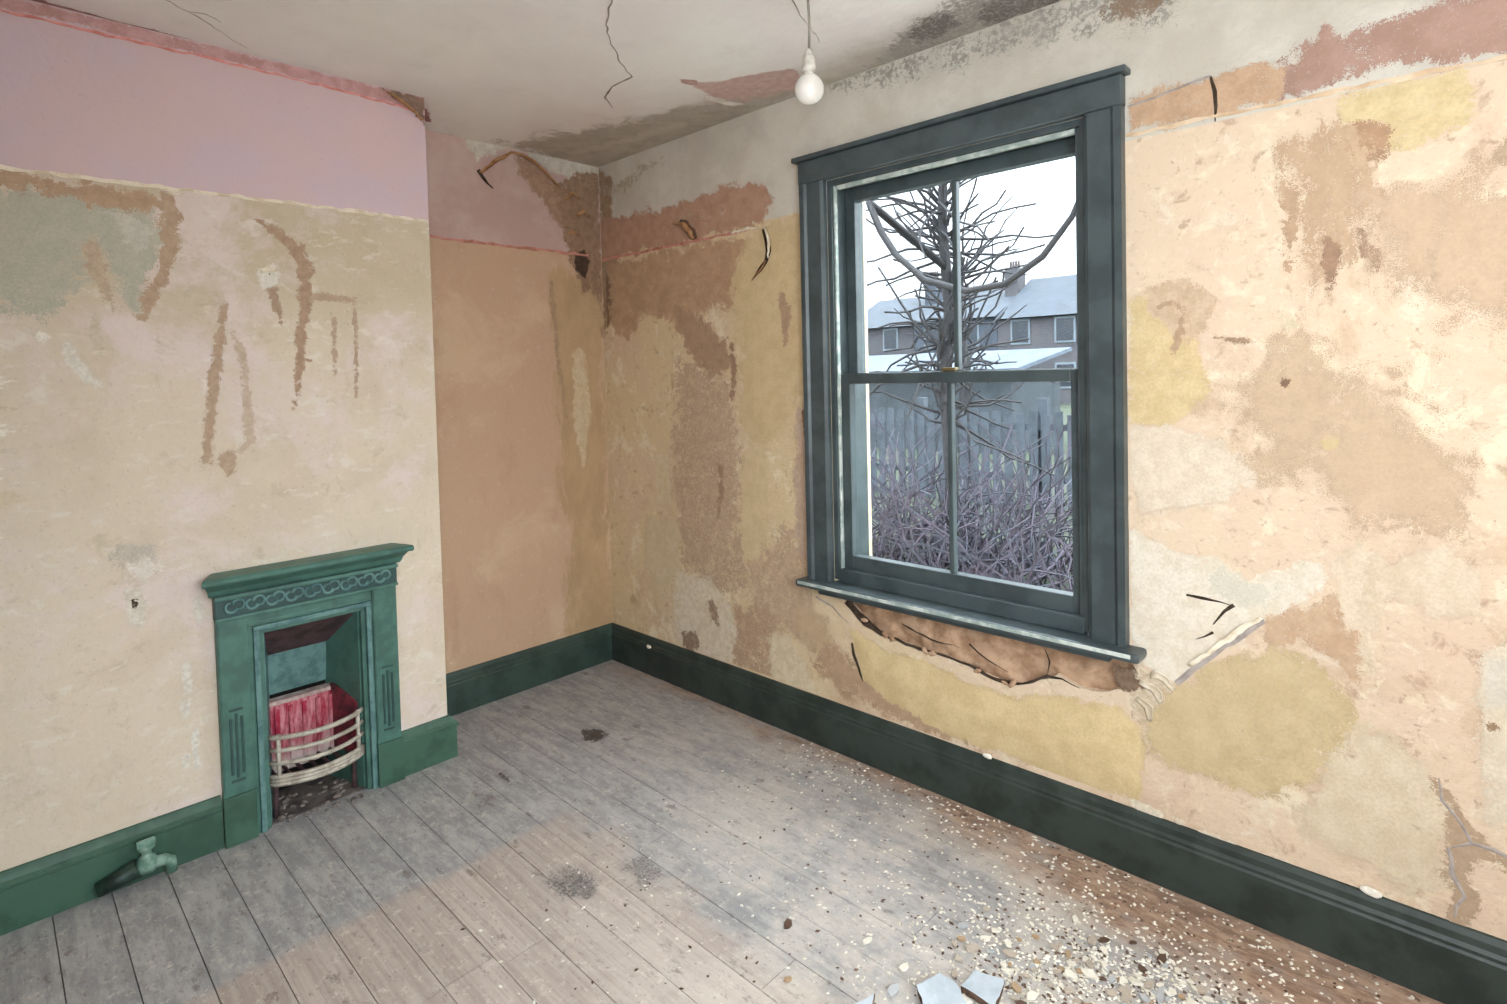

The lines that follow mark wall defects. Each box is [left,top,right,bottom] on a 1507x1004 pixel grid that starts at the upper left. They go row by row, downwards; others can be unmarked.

crack [167,0,246,48]
crack [604,0,633,108]
damp [824,0,1195,98]
peeling [1126,0,1507,164]
peeling [553,153,807,565]
peeling [844,277,1373,726]